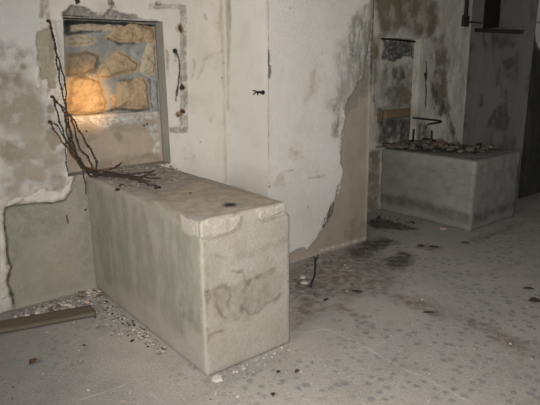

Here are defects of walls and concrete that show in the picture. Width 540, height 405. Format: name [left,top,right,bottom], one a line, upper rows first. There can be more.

leakage [0,97,62,197]
leakage [289,0,455,263]
flaking render [0,175,97,313]
flaking render [179,213,242,239]
flaking render [257,203,287,221]